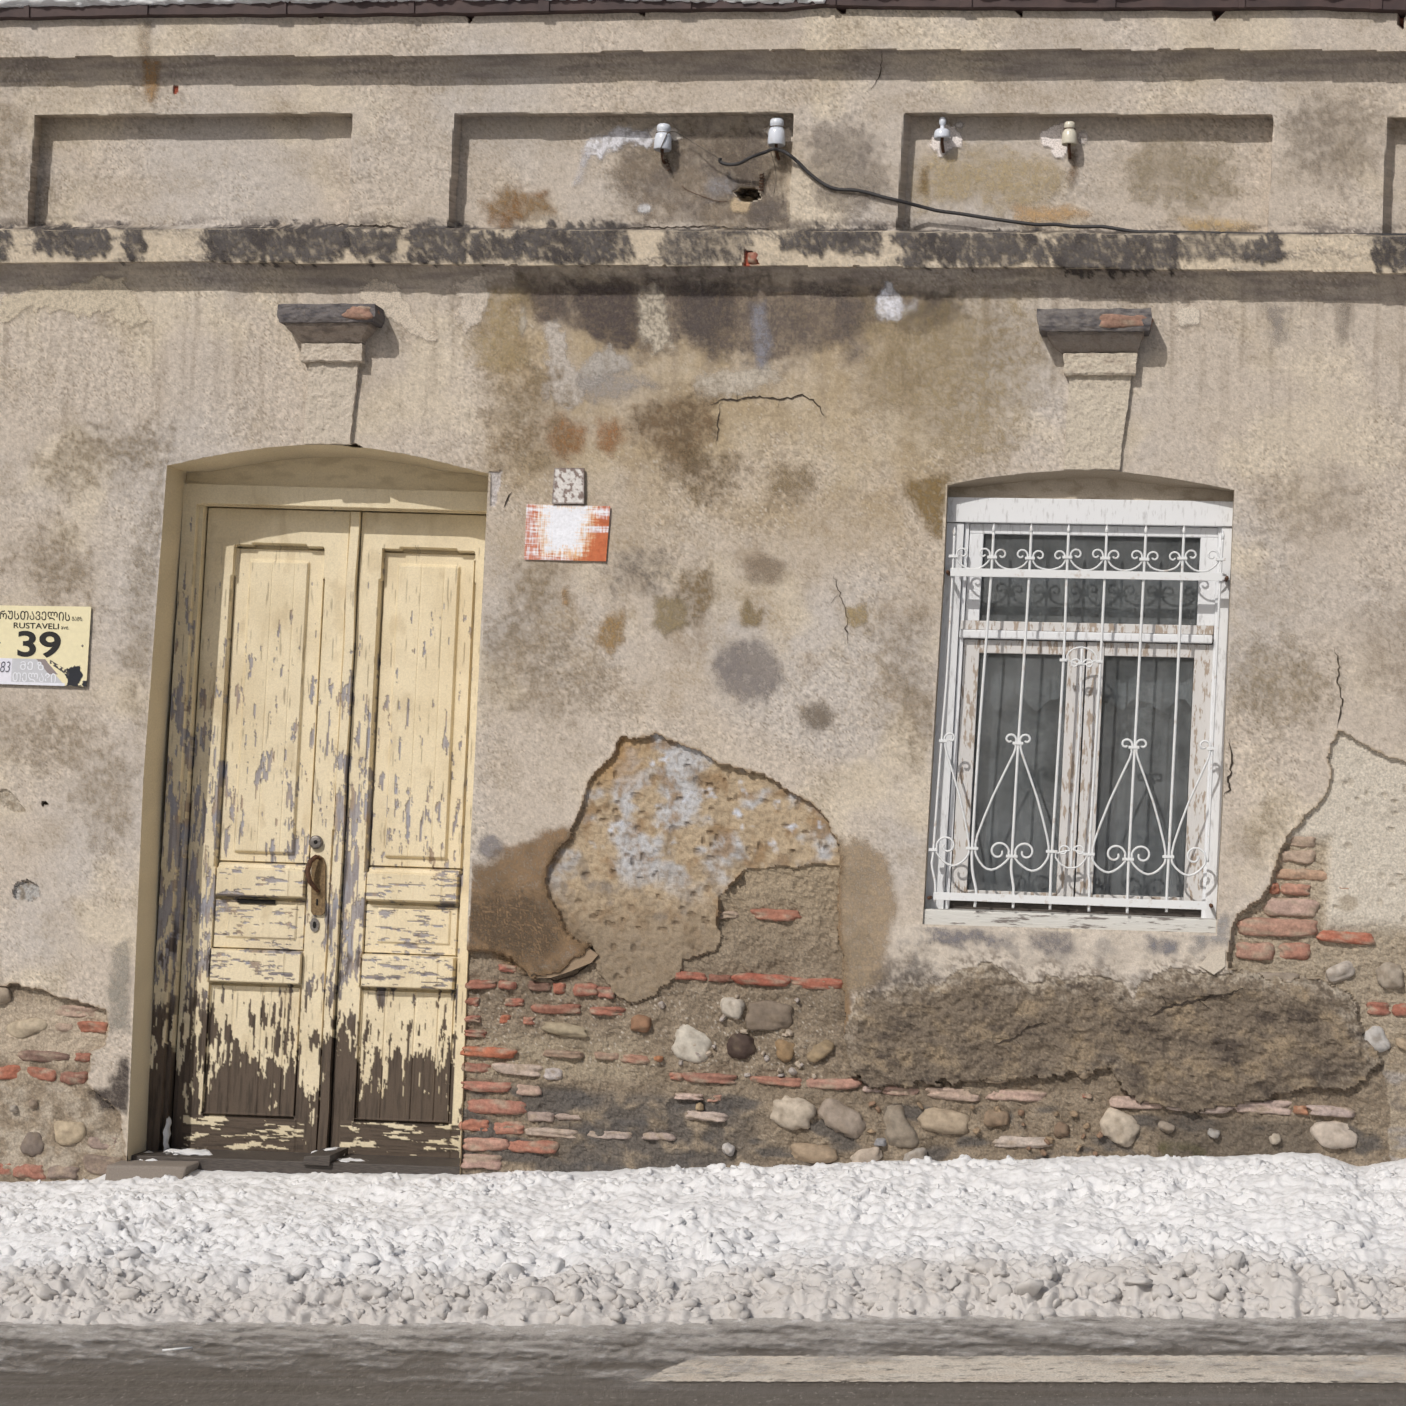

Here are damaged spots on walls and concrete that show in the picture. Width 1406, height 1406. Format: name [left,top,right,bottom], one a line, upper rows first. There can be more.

water stain [475,267,1040,469]
water stain [630,396,738,504]
crack [708,394,823,441]
water stain [599,616,624,654]
water stain [610,550,712,635]
water stain [742,600,762,625]
spalling [0,790,26,813]
spalling [13,880,41,902]
spalling [458,733,1406,1175]
spalling [0,985,128,1183]